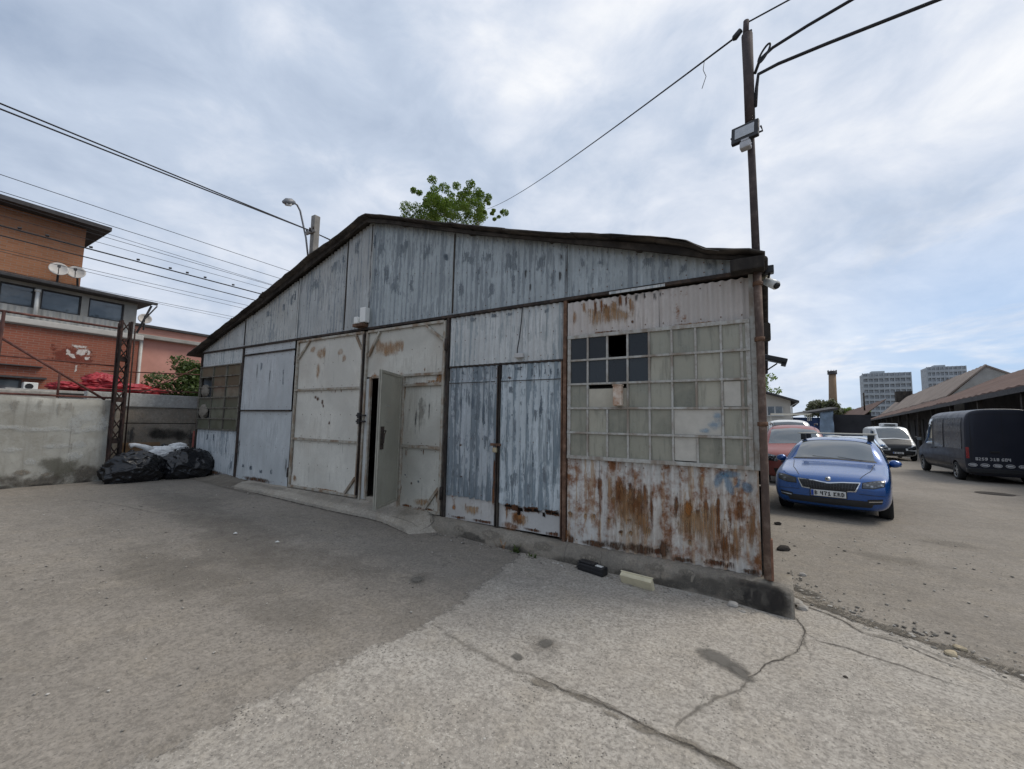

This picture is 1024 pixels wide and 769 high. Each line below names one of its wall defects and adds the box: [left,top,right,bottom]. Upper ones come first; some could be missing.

rust [573,295,634,333]
peeling [66,345,90,371]
rust [452,506,491,524]
rust [505,458,762,577]
crack [533,675,741,769]